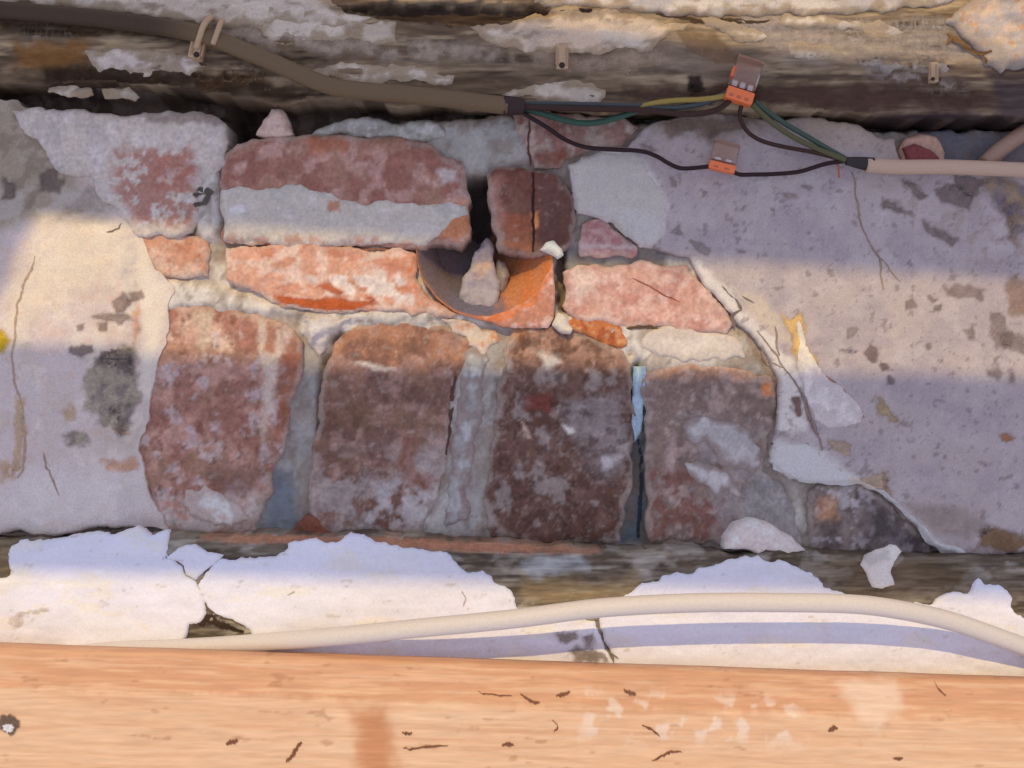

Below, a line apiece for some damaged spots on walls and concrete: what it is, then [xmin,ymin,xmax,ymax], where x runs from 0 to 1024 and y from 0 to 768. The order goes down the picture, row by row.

crack [527,119,535,252]
spalling [672,225,710,255]
crack [851,172,900,290]
crack [11,256,59,495]
crack [722,286,823,450]
crack [199,604,244,633]
flaking render [860,544,902,589]